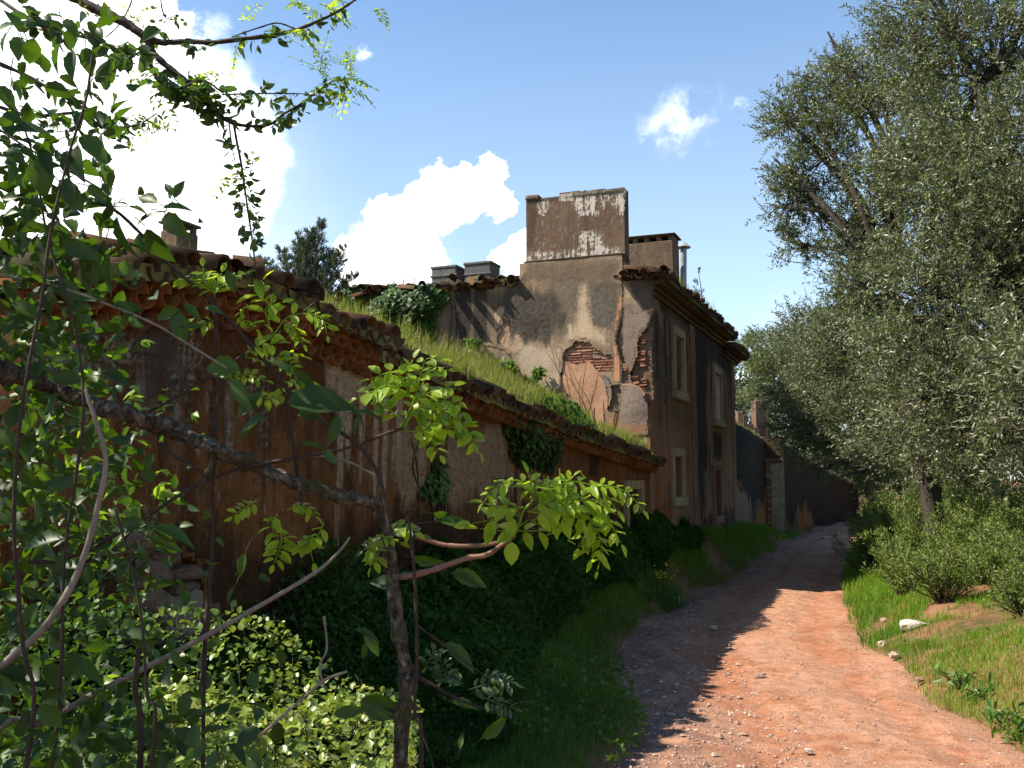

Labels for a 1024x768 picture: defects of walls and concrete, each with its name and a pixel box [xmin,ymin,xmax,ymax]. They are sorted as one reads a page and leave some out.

peeling [526,231,620,261]
peeling [537,188,626,217]
water stain [436,261,766,528]
peeling [560,318,654,425]
water stain [22,309,553,665]
water stain [65,678,114,714]